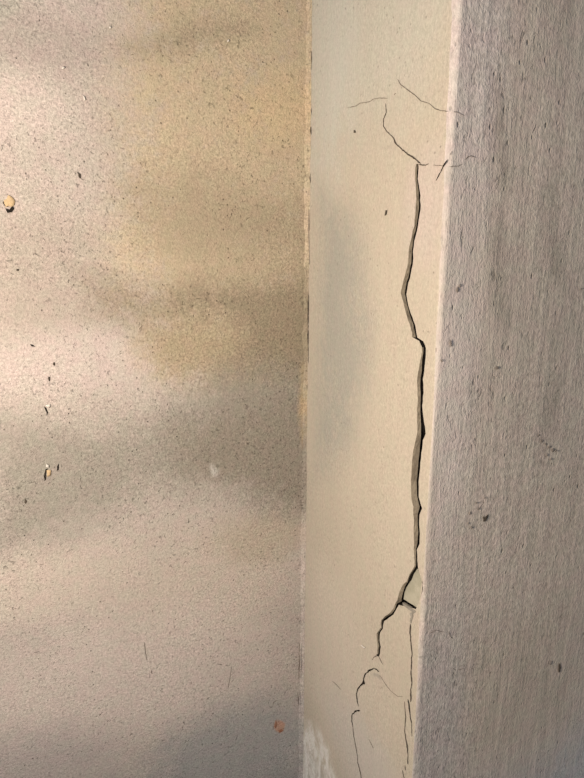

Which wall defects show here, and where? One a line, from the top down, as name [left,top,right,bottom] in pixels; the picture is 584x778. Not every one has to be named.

crack [339,80,474,777]